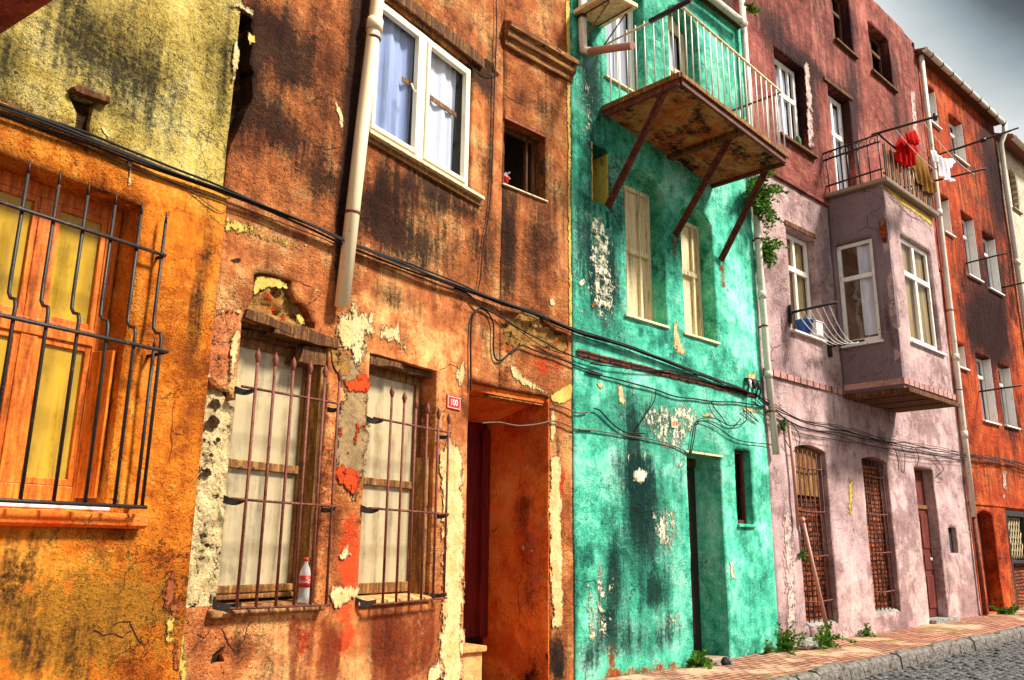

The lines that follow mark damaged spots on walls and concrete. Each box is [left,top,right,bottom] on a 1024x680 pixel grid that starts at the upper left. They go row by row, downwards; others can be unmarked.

crack [94,621,152,655]
spalling [163,274,309,680]
peeling [331,300,407,502]
peeling [428,437,465,680]
peeling [502,82,616,640]
leakage [626,449,656,548]
peeling [652,504,682,552]
peeling [642,401,713,472]